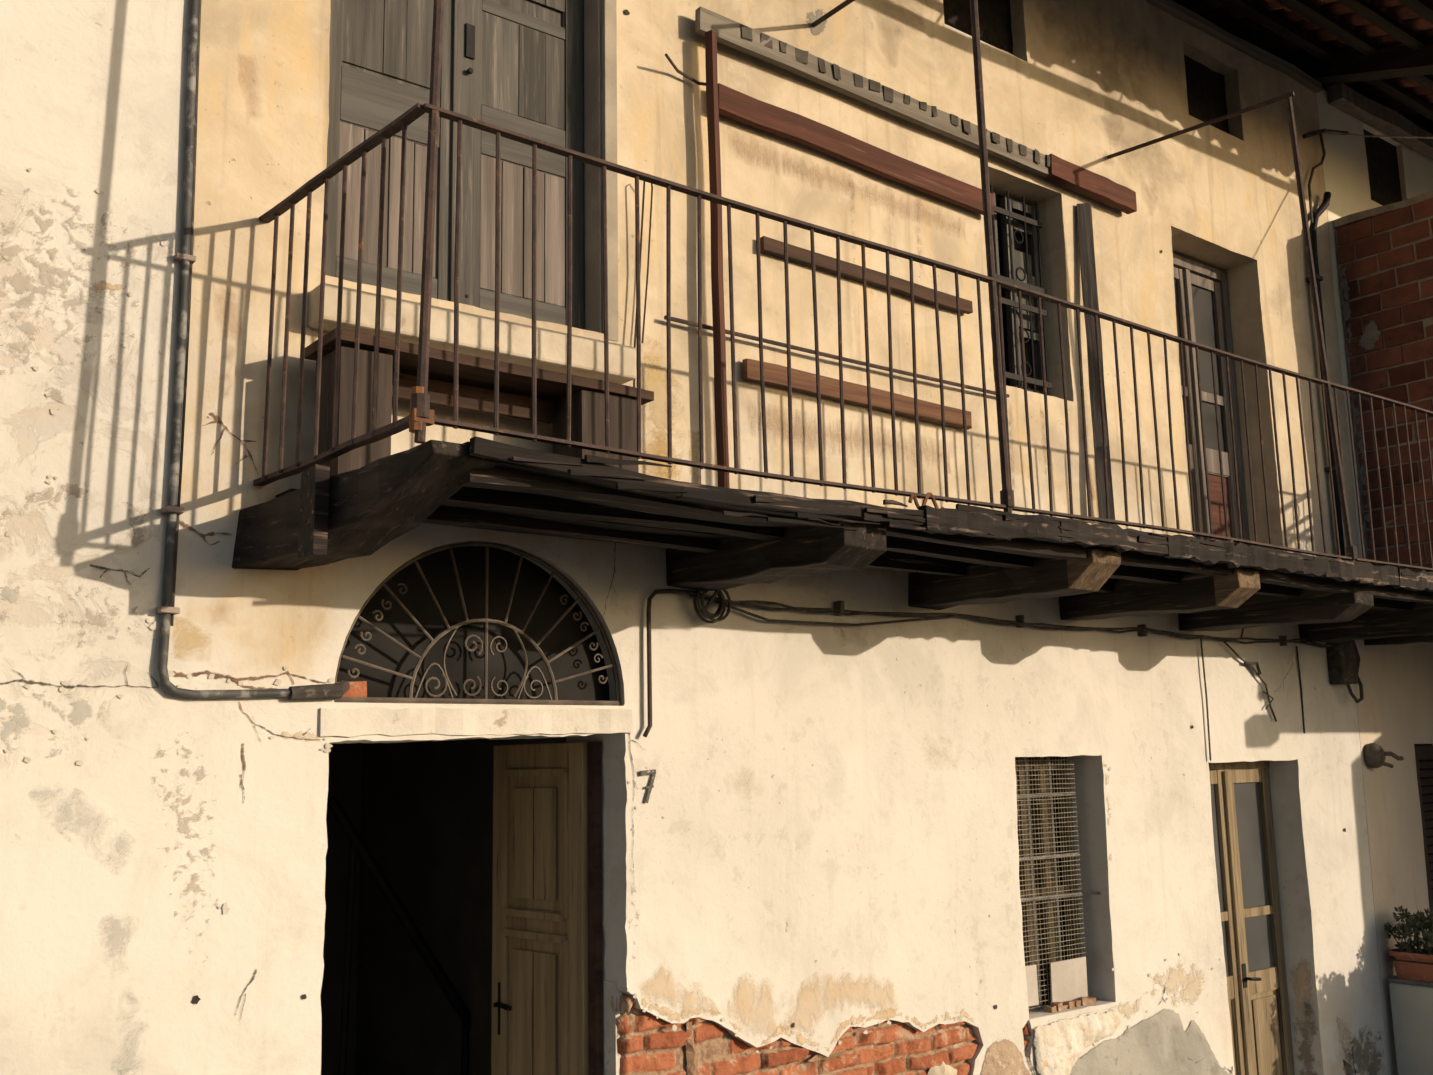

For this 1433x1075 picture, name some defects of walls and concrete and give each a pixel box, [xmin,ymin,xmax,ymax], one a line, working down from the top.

peeling [0,168,139,415]
crack [203,412,259,475]
peeling [0,475,88,541]
peeling [117,503,157,549]
peeling [0,587,20,620]
peeling [56,588,161,647]
crack [89,561,150,585]
crack [0,666,335,804]
flaking render [616,989,1031,1075]